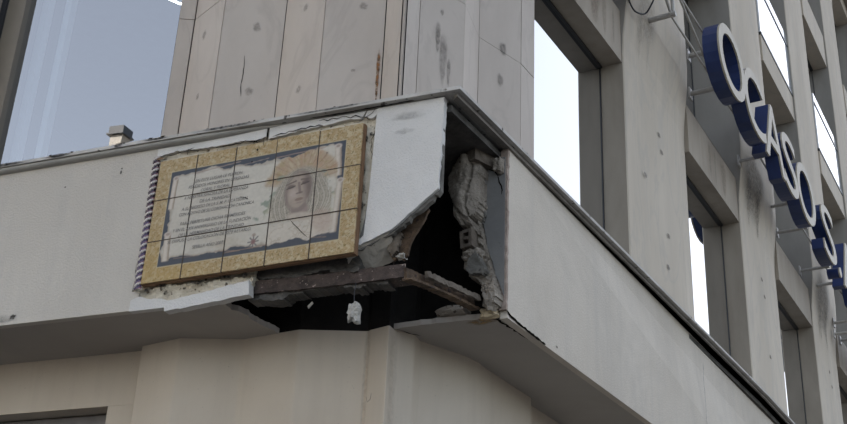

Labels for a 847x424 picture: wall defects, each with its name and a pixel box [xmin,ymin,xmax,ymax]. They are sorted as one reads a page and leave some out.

spalling [129,97,510,320]